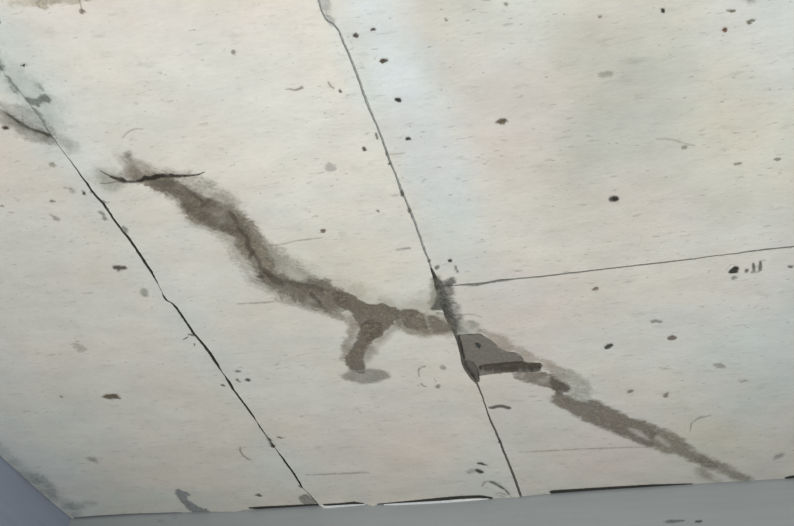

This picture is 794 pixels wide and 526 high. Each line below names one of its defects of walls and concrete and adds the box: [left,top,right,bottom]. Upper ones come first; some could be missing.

crack [1,69,319,505]
damp [128,167,451,383]
spalling [457,334,542,383]
crack [318,0,794,496]
damp [515,364,751,480]